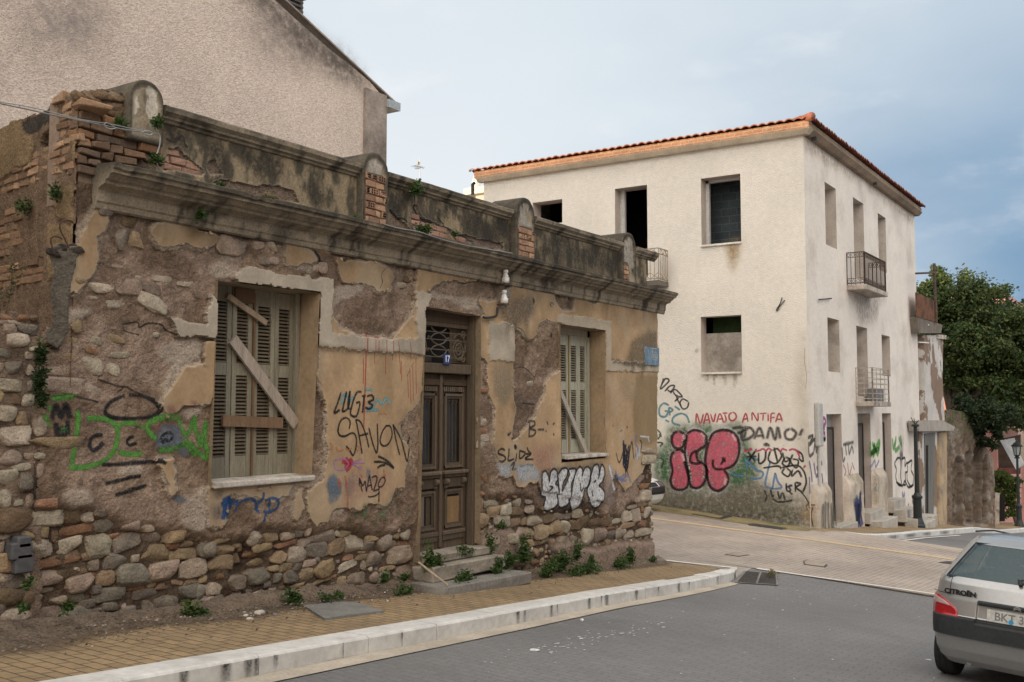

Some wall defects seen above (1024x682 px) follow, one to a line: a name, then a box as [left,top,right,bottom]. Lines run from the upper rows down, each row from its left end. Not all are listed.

flaking render [34,172,511,580]
flaking render [512,294,597,440]
flaking render [480,357,641,518]
flaking render [550,539,655,567]